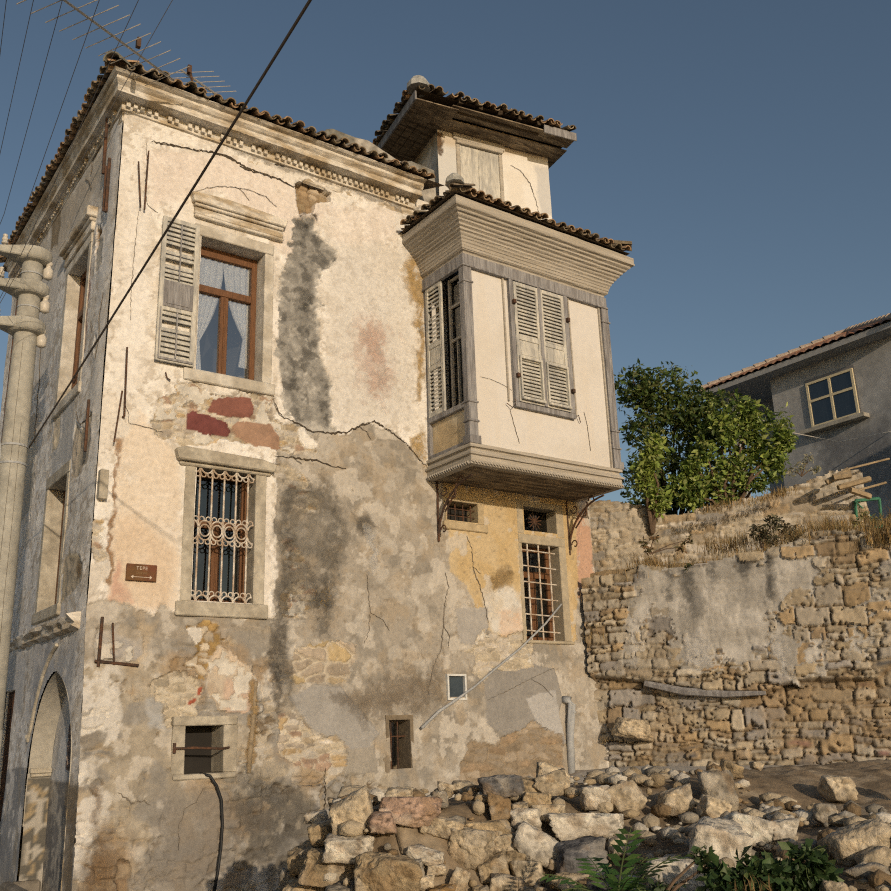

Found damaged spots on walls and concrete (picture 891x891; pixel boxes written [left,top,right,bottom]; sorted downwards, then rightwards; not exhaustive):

crack [130,140,295,320]
flaking render [150,380,318,454]
crack [273,399,428,469]
flaking render [272,463,322,515]
flaking render [94,622,145,663]
flaking render [149,619,255,728]
flaking render [284,640,358,683]
flaking render [845,585,891,662]